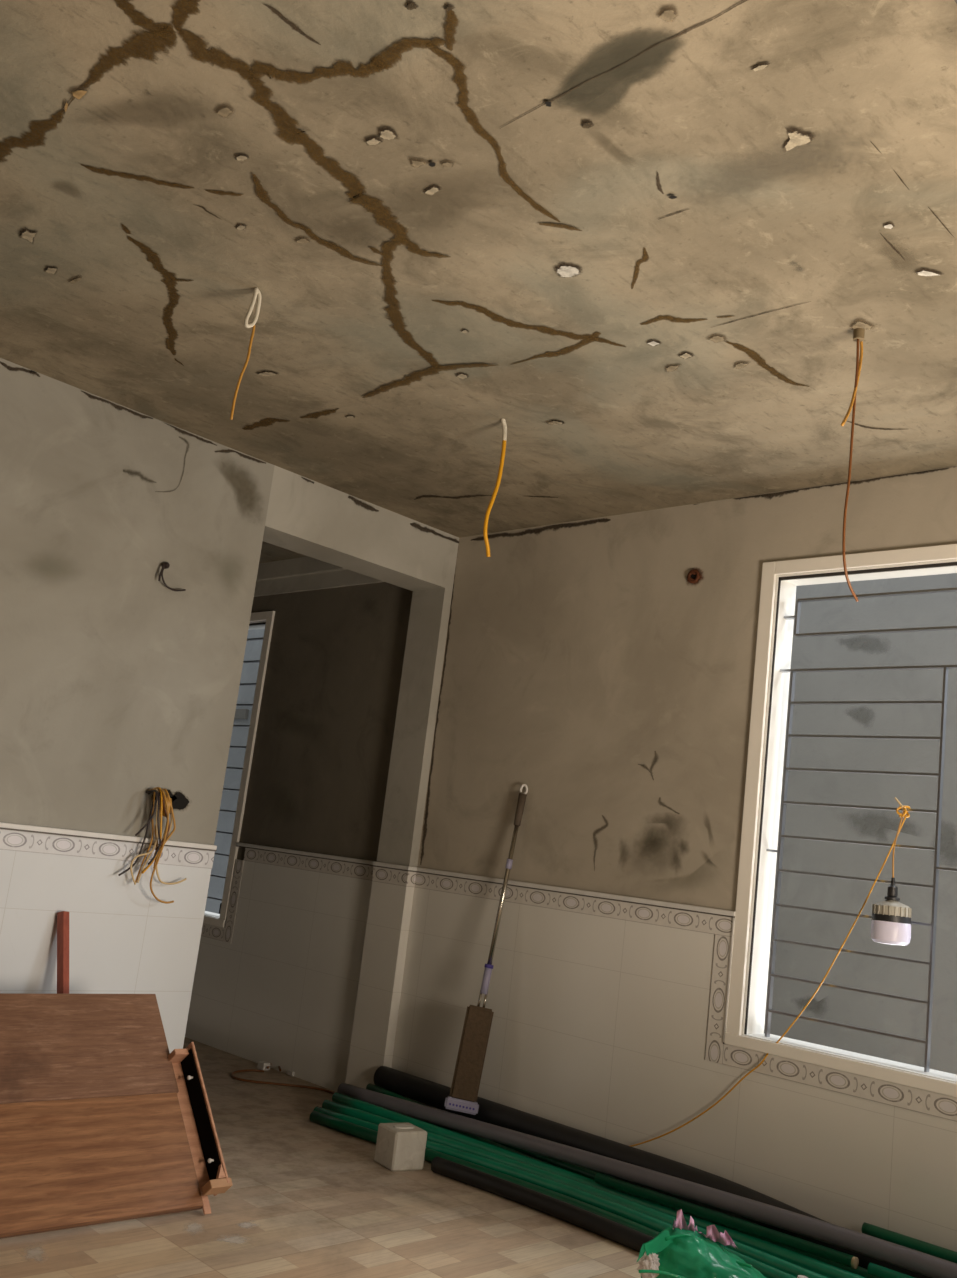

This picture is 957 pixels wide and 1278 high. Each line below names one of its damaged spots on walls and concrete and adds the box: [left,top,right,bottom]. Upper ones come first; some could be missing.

leakage [558,32,676,112]
spalling [365,127,398,145]
spalling [783,127,814,151]
crack [0,0,811,492]
spalling [555,263,582,277]
spalling [916,268,942,276]
crack [348,496,379,512]